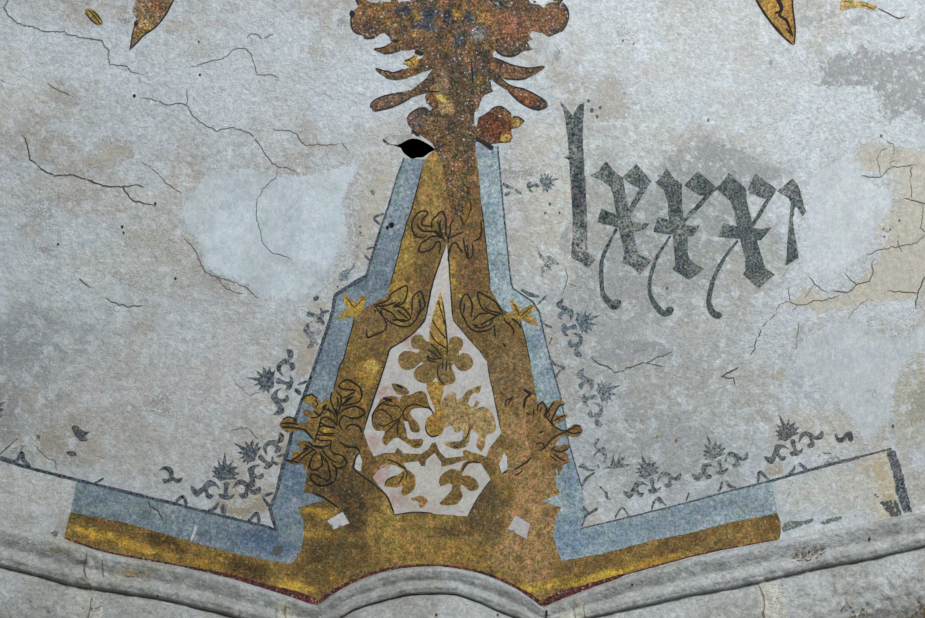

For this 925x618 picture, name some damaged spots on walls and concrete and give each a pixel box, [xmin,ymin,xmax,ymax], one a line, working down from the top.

crack [4,0,143,75]
crack [190,33,279,78]
crack [22,135,181,207]
crack [144,90,348,260]
spalling [383,134,446,159]
crack [79,278,143,308]
crack [181,235,258,298]
flaking render [287,160,394,319]
crack [721,141,925,384]